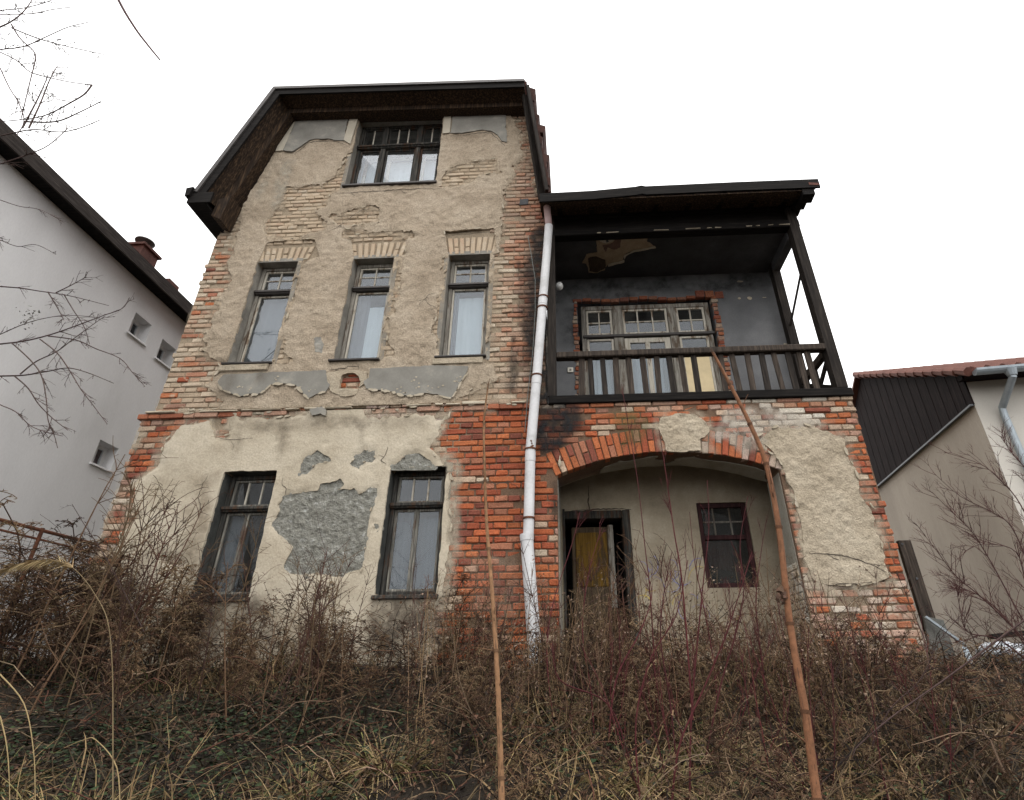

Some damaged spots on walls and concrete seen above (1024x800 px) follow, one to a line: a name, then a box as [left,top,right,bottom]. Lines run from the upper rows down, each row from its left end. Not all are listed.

spalling [72,154,415,613]
spalling [339,116,926,670]